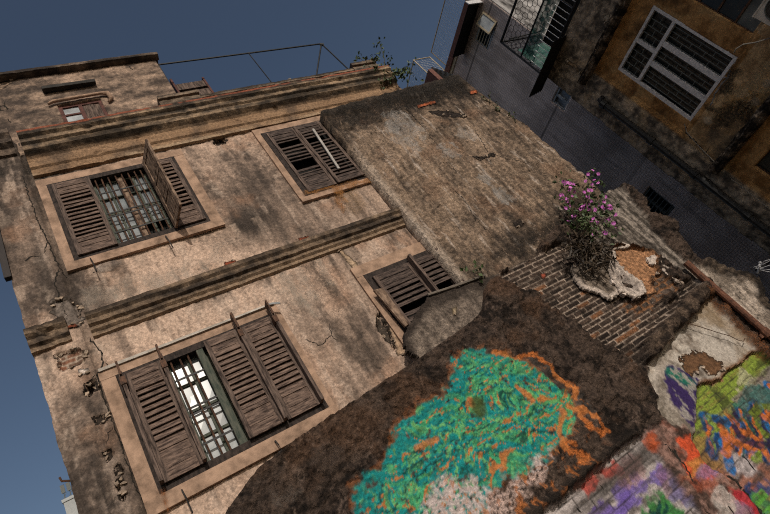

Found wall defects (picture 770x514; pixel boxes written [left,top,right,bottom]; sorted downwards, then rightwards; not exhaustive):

crack [23,177,70,316]
spalling [49,295,86,329]
spalling [376,312,409,356]
flaking render [497,240,702,368]
spalling [53,347,101,397]
spalling [678,350,726,377]
spalling [91,411,111,425]
spalling [101,448,127,502]